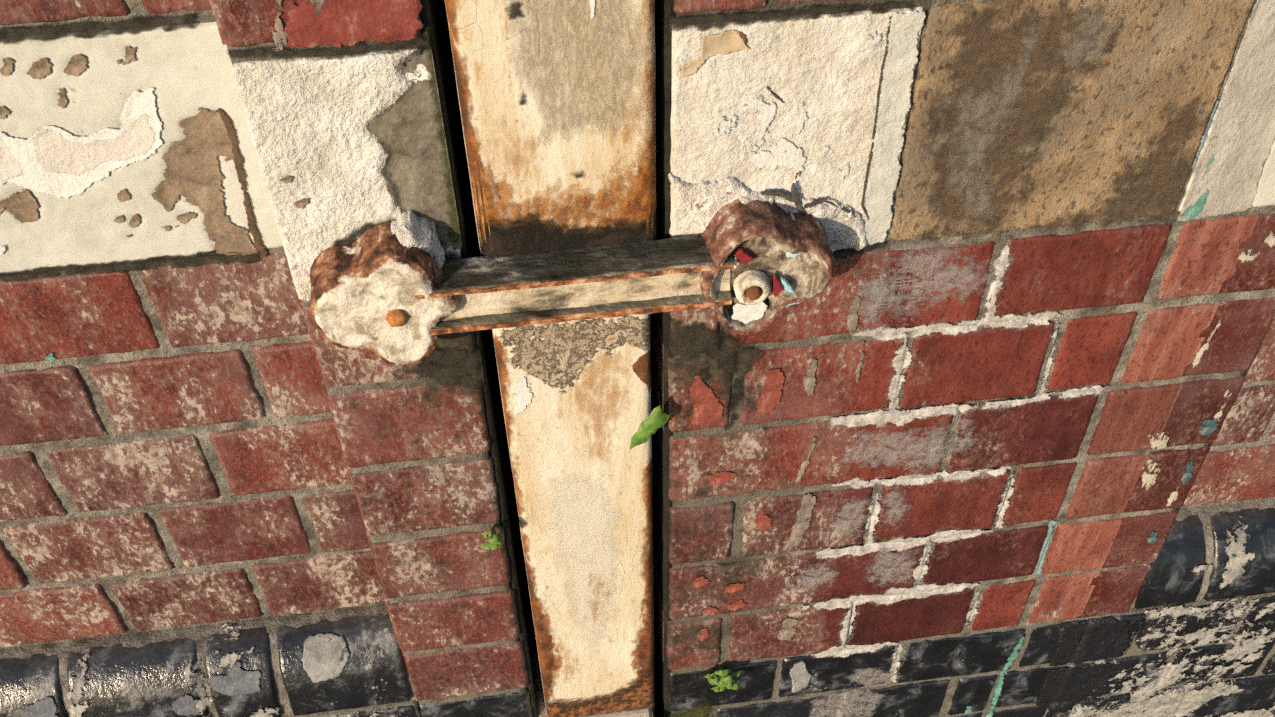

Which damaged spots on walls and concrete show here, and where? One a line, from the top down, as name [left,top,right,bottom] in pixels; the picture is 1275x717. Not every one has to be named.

peeling [0,54,87,109]
peeling [0,88,257,256]
spalling [272,0,423,51]
peeling [367,50,462,251]
corrosion [445,0,656,236]
water stain [847,0,1113,383]
water stain [1047,99,1210,228]
peeling [1177,0,1275,221]
corrosion [493,314,655,717]
water stain [785,437,817,549]
water stain [777,473,1015,683]
water stain [830,321,1106,473]